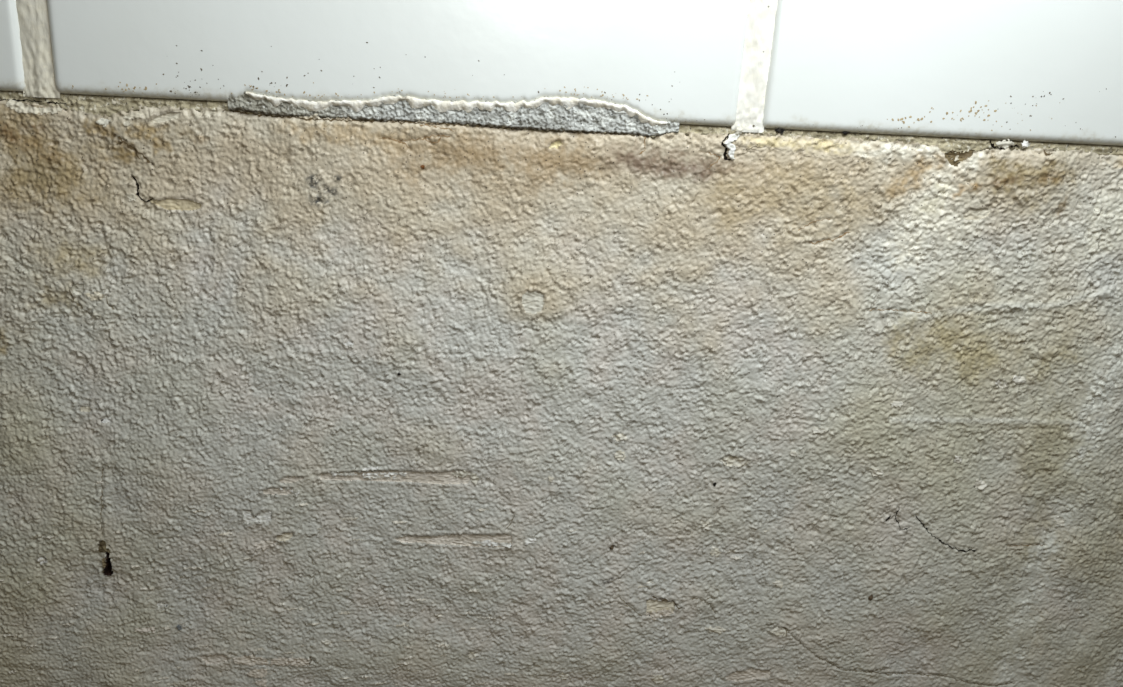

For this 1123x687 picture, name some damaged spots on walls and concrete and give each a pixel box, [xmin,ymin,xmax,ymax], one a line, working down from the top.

spalling [228,91,679,149]
leakage [887,91,1064,131]
crack [111,133,154,202]
leakage [0,101,154,361]
leakage [234,112,1123,687]
crack [895,510,976,552]
crack [770,624,1015,686]